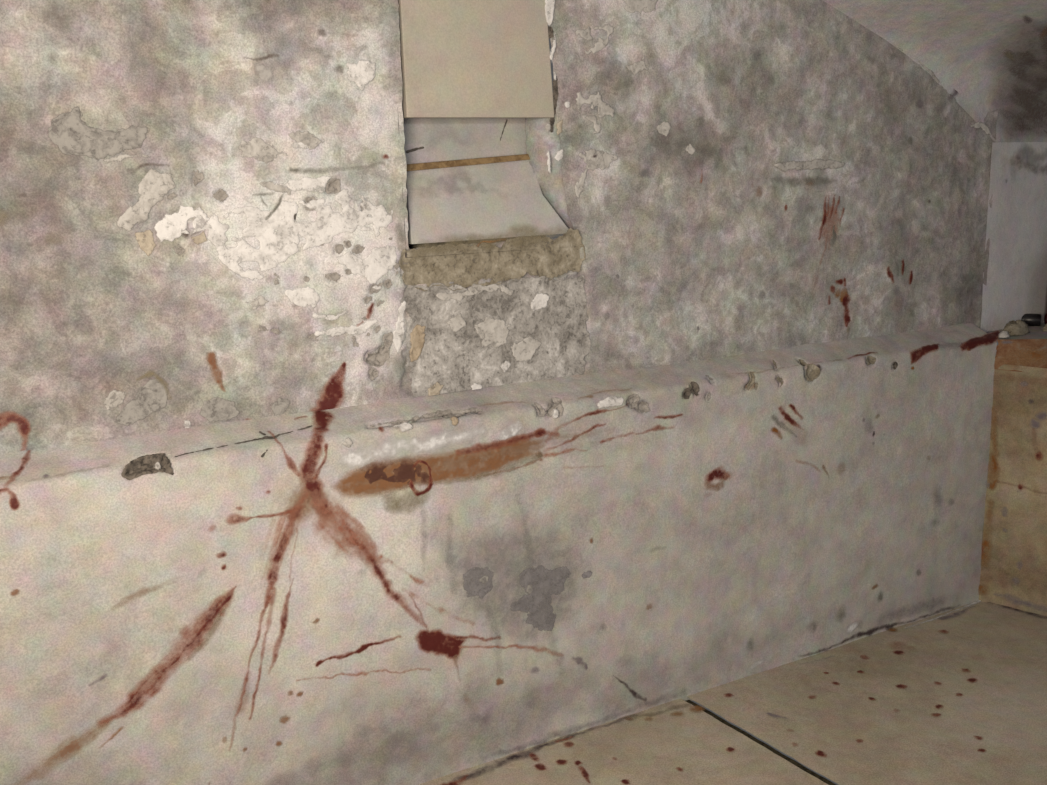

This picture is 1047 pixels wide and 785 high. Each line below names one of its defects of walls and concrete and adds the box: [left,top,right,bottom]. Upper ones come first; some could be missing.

water stain [1006,28,1047,133]
spalling [48,106,591,397]
water stain [229,362,422,719]
water stain [417,630,546,658]